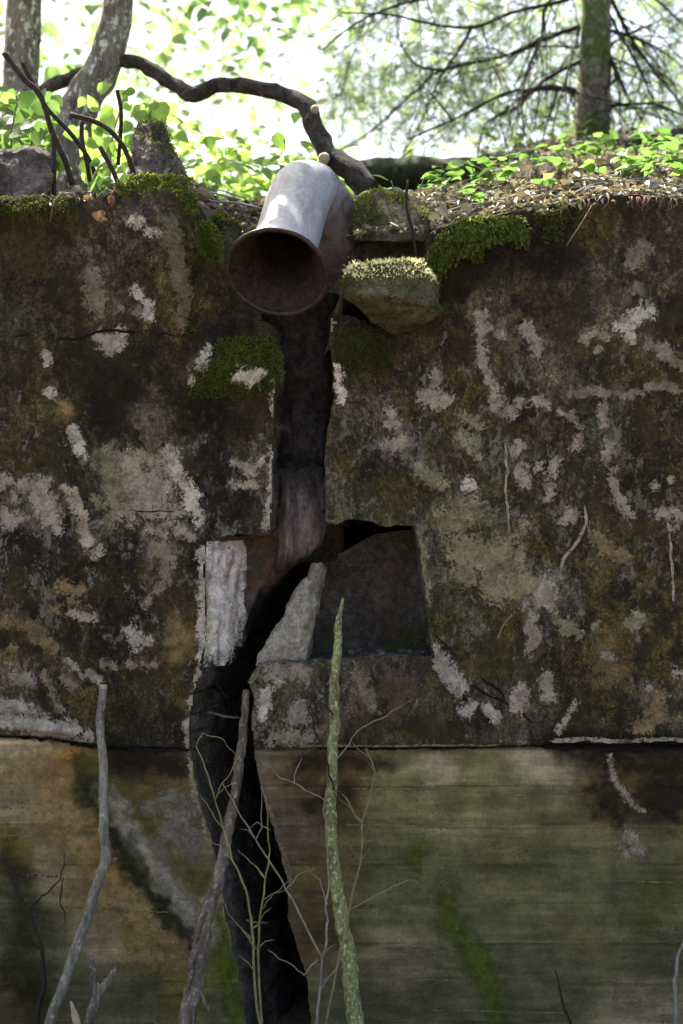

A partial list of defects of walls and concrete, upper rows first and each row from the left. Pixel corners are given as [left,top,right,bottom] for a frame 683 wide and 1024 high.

crack [269,330,286,534]
leakage [74,750,211,950]
crack [0,639,312,1024]